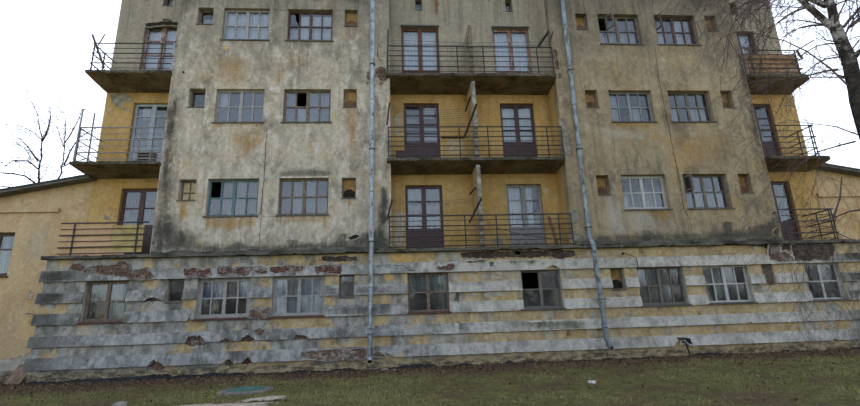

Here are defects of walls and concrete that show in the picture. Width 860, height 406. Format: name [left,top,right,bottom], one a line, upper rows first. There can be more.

spalling [435,208,587,272]
spalling [749,211,836,263]
spalling [69,260,155,282]
spalling [182,255,357,280]
peeling [0,348,32,371]
spalling [185,336,205,346]
spalling [293,335,386,362]